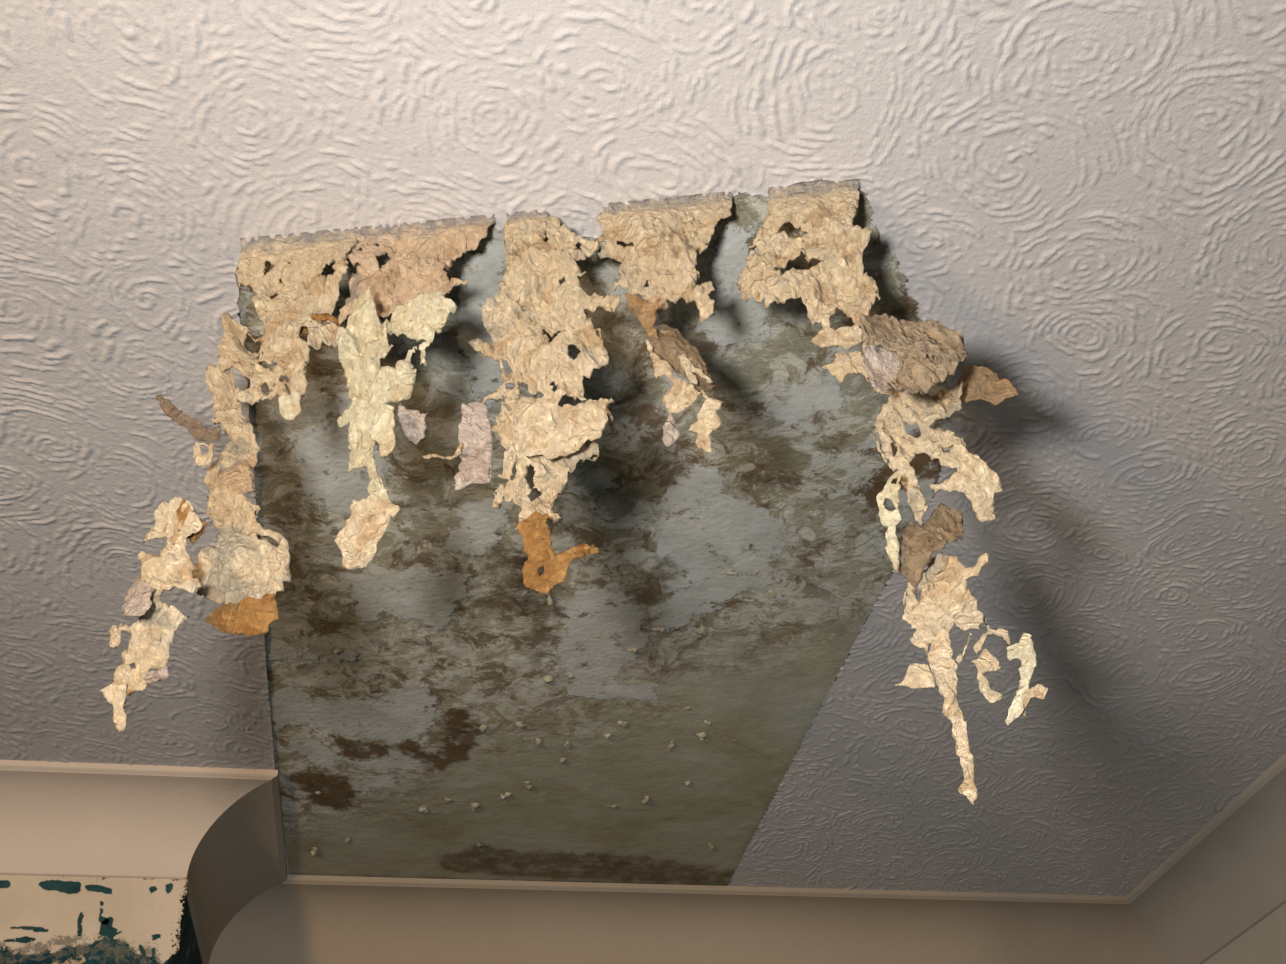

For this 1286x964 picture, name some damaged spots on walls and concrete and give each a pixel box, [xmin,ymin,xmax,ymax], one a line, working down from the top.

leakage [852,429,944,512]
flaking render [99,179,1048,885]
leakage [475,543,560,656]
leakage [330,708,482,770]
leakage [287,771,361,811]
leakage [441,846,735,884]